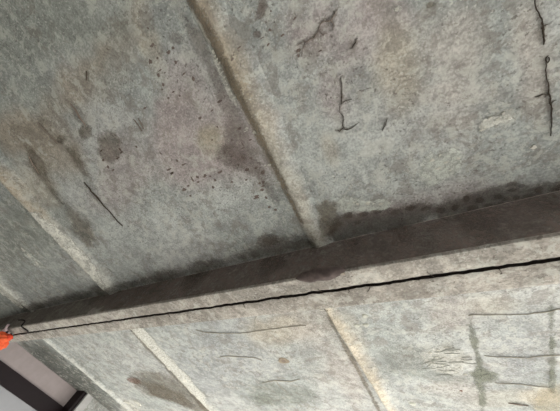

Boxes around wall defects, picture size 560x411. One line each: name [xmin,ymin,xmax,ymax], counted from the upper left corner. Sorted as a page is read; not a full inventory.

crack [297,12,336,57]
crack [534,0,556,136]
crack [84,182,122,226]
damp [0,182,560,329]
crack [13,257,560,336]